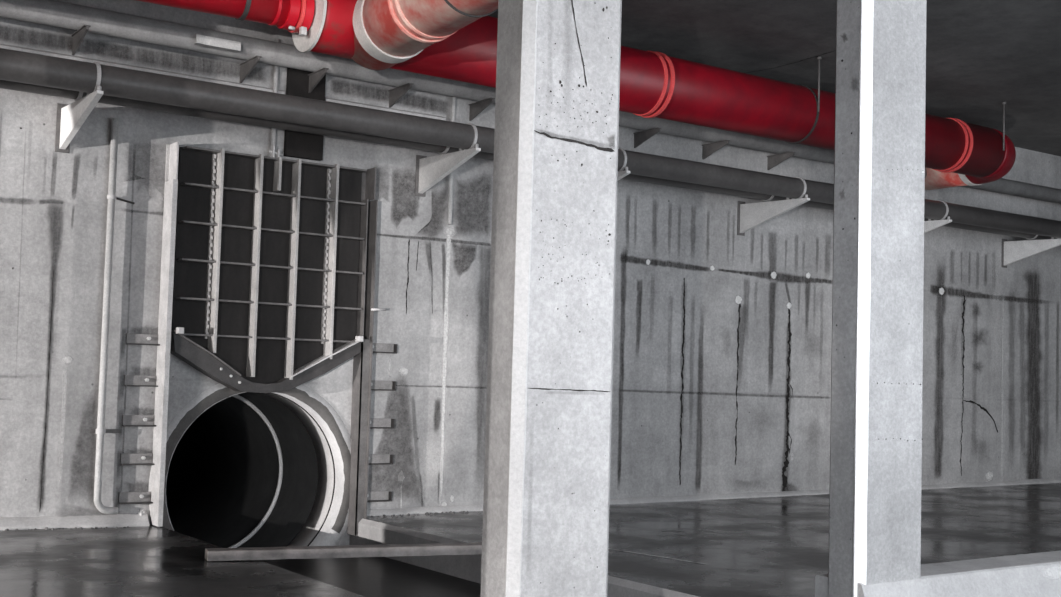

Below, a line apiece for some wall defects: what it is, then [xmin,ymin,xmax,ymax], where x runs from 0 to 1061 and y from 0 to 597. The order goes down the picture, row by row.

crack [571,0,587,86]
leakage [393,173,417,222]
crack [534,130,614,152]
leakage [370,392,418,508]
leakage [416,177,490,506]
leakage [618,253,831,481]
crack [782,309,793,491]
crack [960,295,998,476]
leakage [931,272,1041,481]